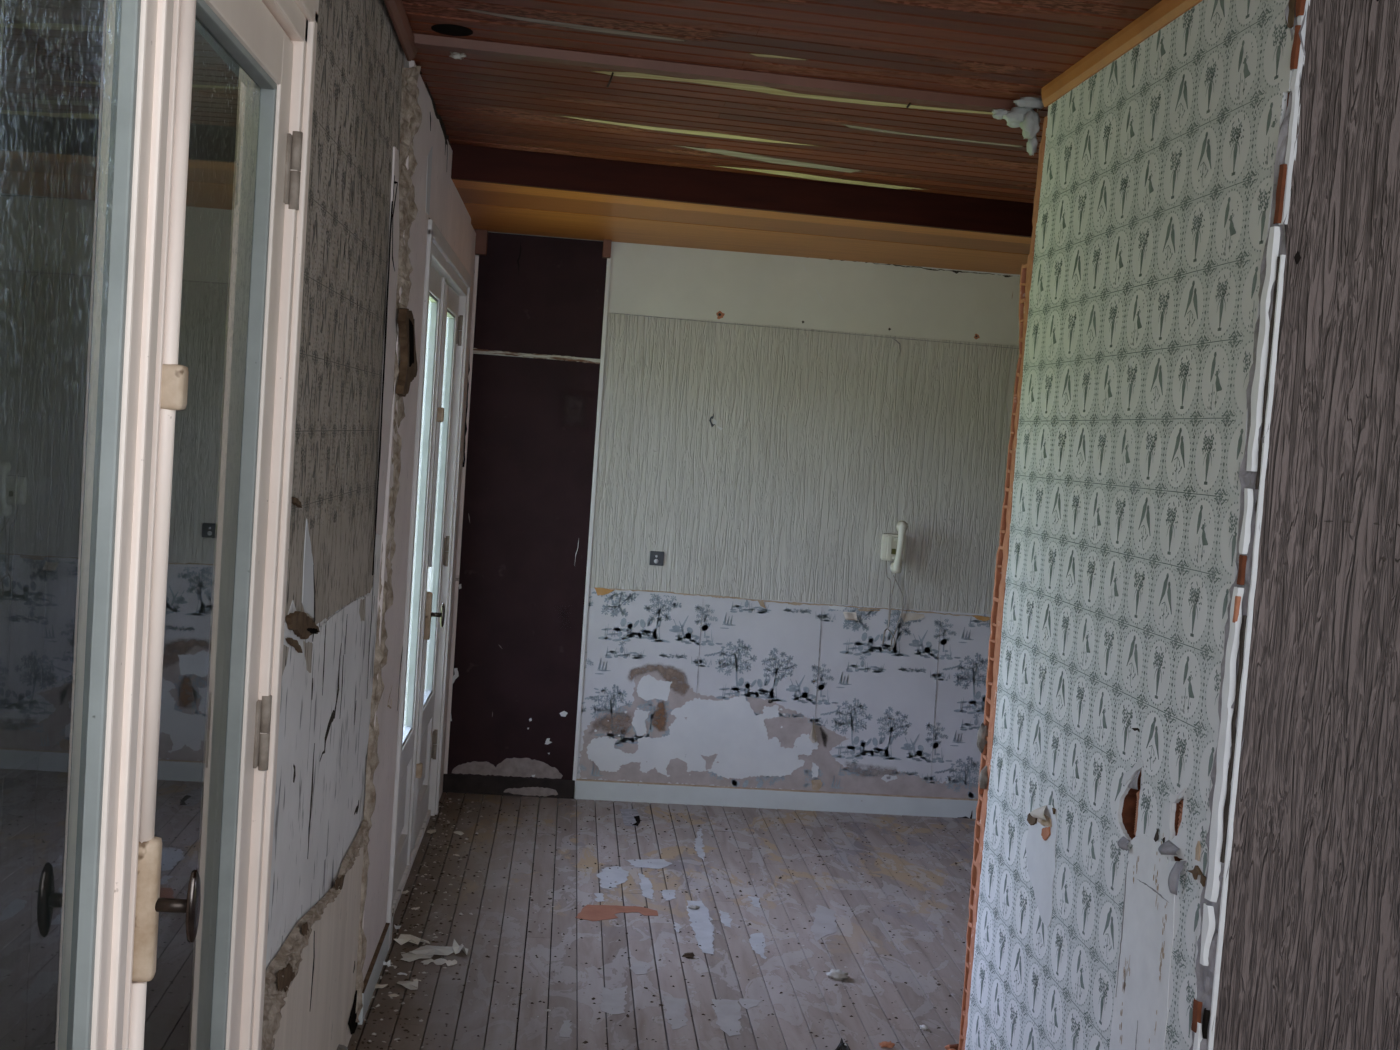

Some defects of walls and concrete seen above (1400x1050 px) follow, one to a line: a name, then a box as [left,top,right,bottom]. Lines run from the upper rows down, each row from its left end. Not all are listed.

peeling [594,674,672,736]
peeling [452,738,563,797]
spalling [1154,787,1188,895]
spalling [261,819,369,1050]